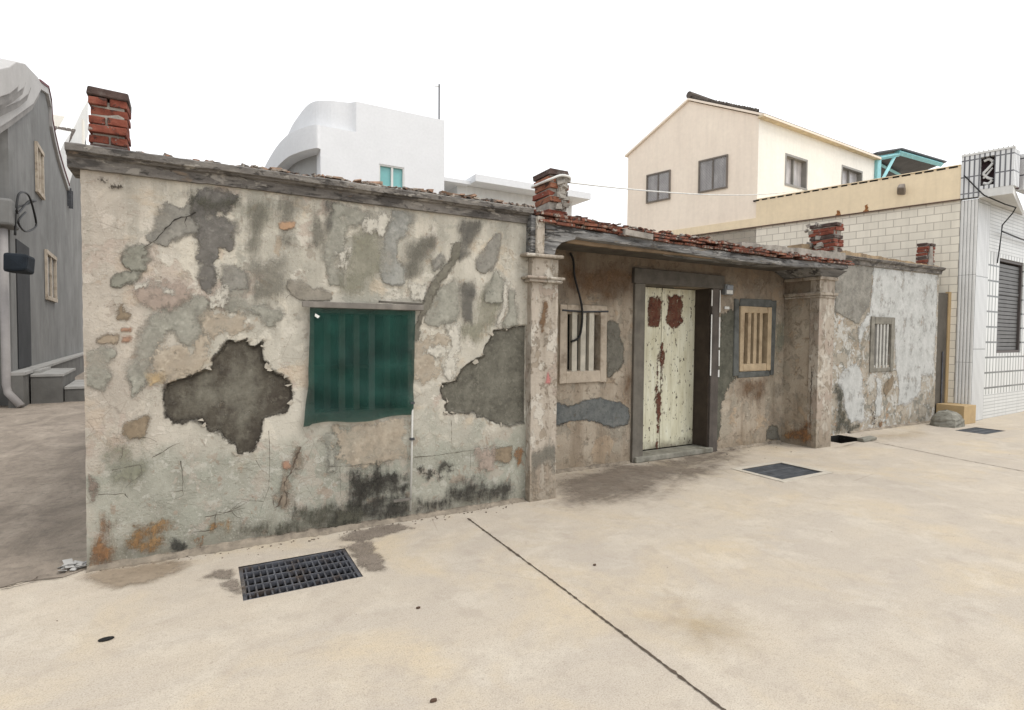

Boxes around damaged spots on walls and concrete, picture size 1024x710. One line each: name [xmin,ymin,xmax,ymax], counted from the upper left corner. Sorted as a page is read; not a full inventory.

crack [143,212,196,248]
spalling [149,268,295,456]
spalling [414,282,525,427]
peeling [838,268,937,425]
water stain [251,462,511,535]